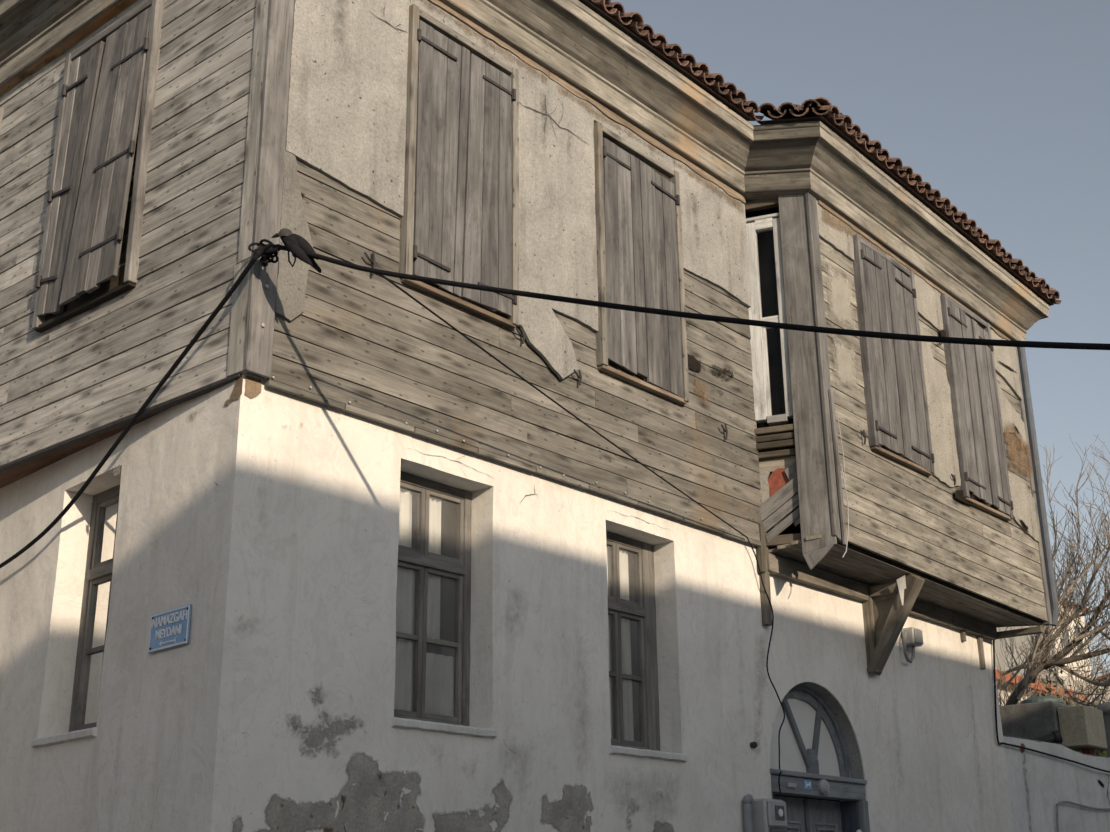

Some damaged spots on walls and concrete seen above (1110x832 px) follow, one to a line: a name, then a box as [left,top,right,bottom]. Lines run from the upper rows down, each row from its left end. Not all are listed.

crack [519,96,588,144]
flaking render [291,688,362,757]
flaking render [233,817,243,832]
flaking render [258,753,512,832]
flaking render [541,784,593,832]
flaking render [654,821,674,832]